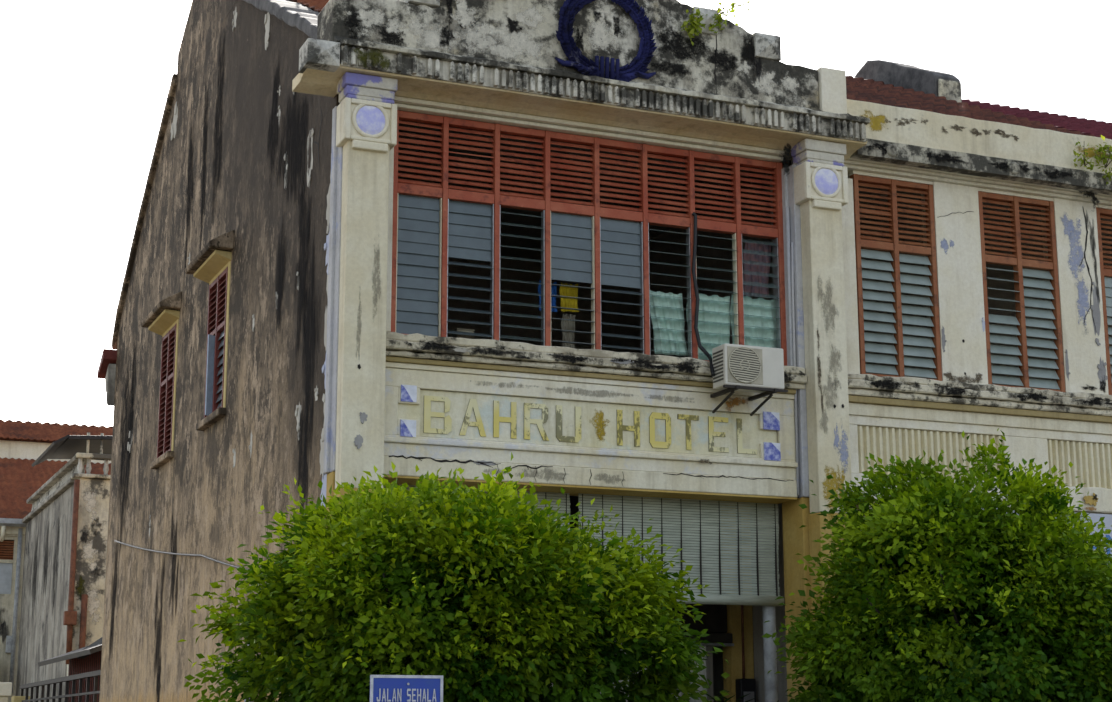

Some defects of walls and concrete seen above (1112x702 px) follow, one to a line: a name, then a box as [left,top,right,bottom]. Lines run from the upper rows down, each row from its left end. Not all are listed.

water stain [357,26,405,70]
water stain [440,0,477,47]
water stain [506,18,522,33]
water stain [651,26,762,82]
water stain [185,35,225,268]
water stain [267,62,318,516]
peeling [1062,215,1108,387]
crack [1079,206,1096,330]
water stain [611,357,700,374]
water stain [933,372,982,395]
water stain [1073,380,1112,406]
water stain [91,344,136,661]